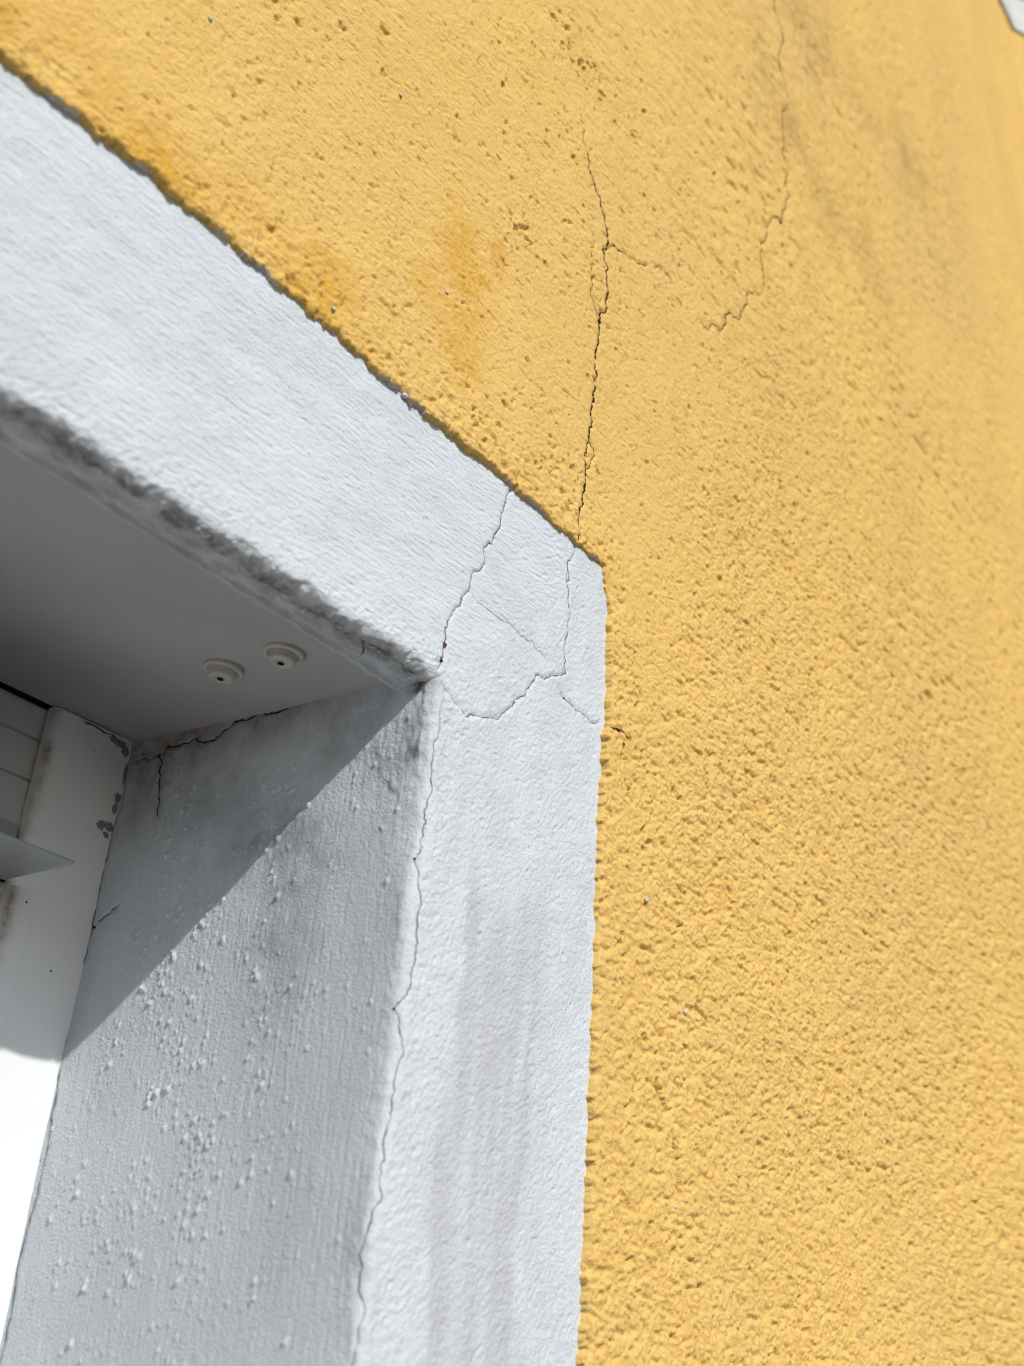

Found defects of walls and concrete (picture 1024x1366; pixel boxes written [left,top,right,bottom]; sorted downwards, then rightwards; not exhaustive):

crack [351,122,670,1366]
crack [702,1,790,332]